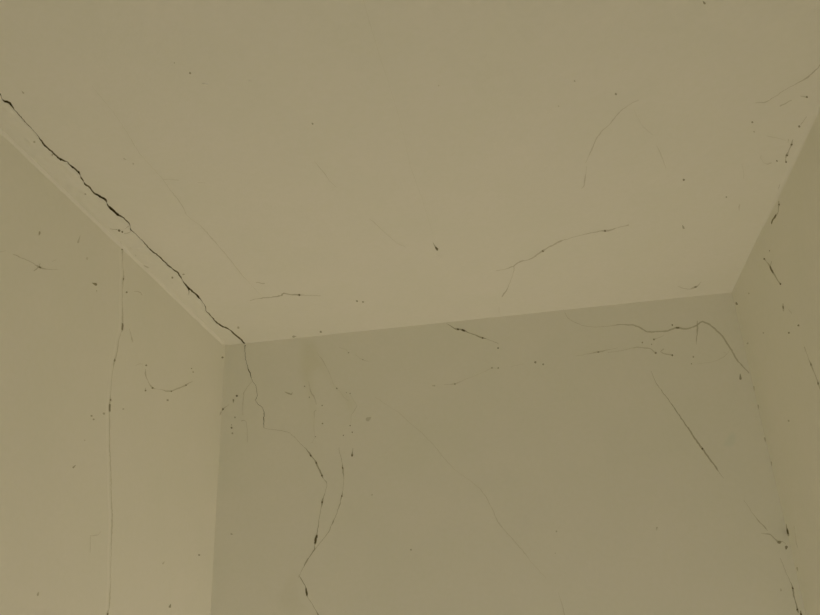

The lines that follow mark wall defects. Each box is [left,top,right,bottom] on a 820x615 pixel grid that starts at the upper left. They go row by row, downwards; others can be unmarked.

crack [0,94,357,615]
crack [565,313,749,373]
crack [652,374,721,475]
crack [745,502,802,615]